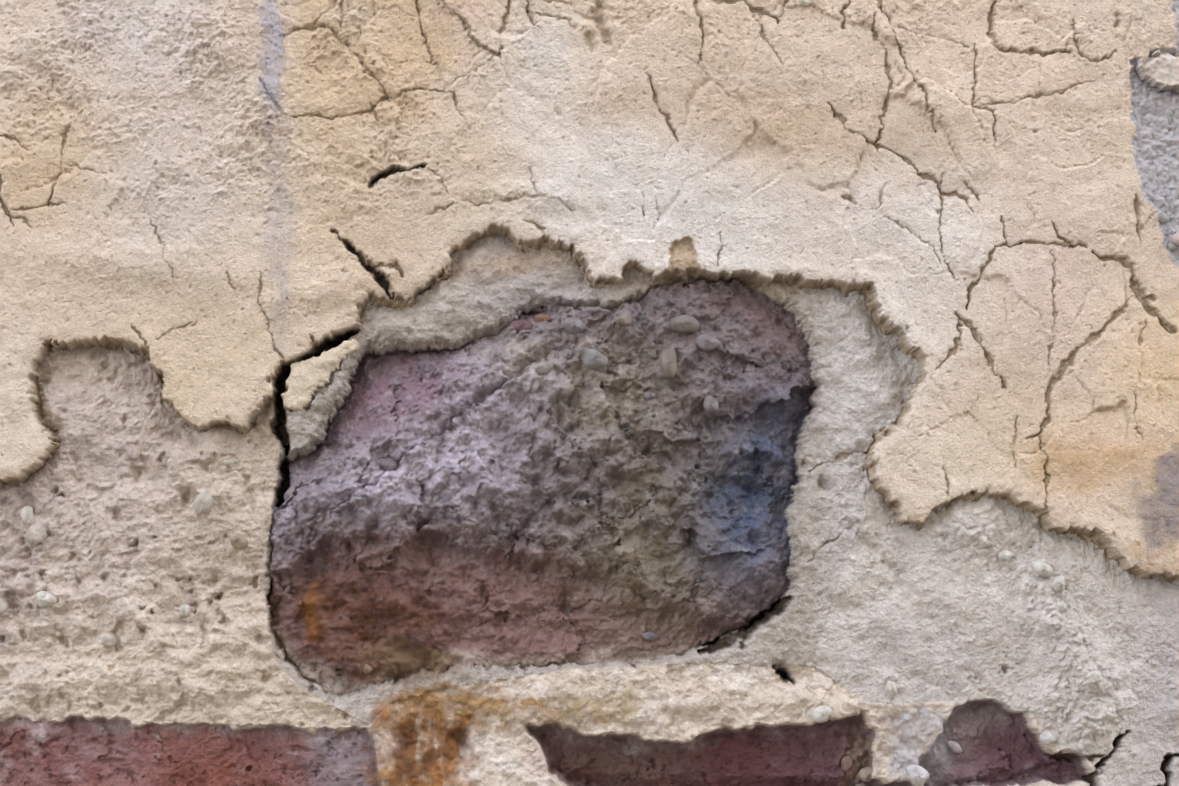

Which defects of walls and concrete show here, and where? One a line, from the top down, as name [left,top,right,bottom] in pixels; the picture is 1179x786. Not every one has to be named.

crack [694,0,789,61]
crack [829,0,979,206]
crack [971,3,1109,136]
crack [0,127,90,223]
crack [369,165,426,188]
crack [332,231,439,302]
crack [941,222,1176,488]
crack [273,331,359,508]
spalling [0,226,1179,786]
corrosion [375,683,544,786]
crack [1045,730,1128,786]
crack [1157,754,1179,786]